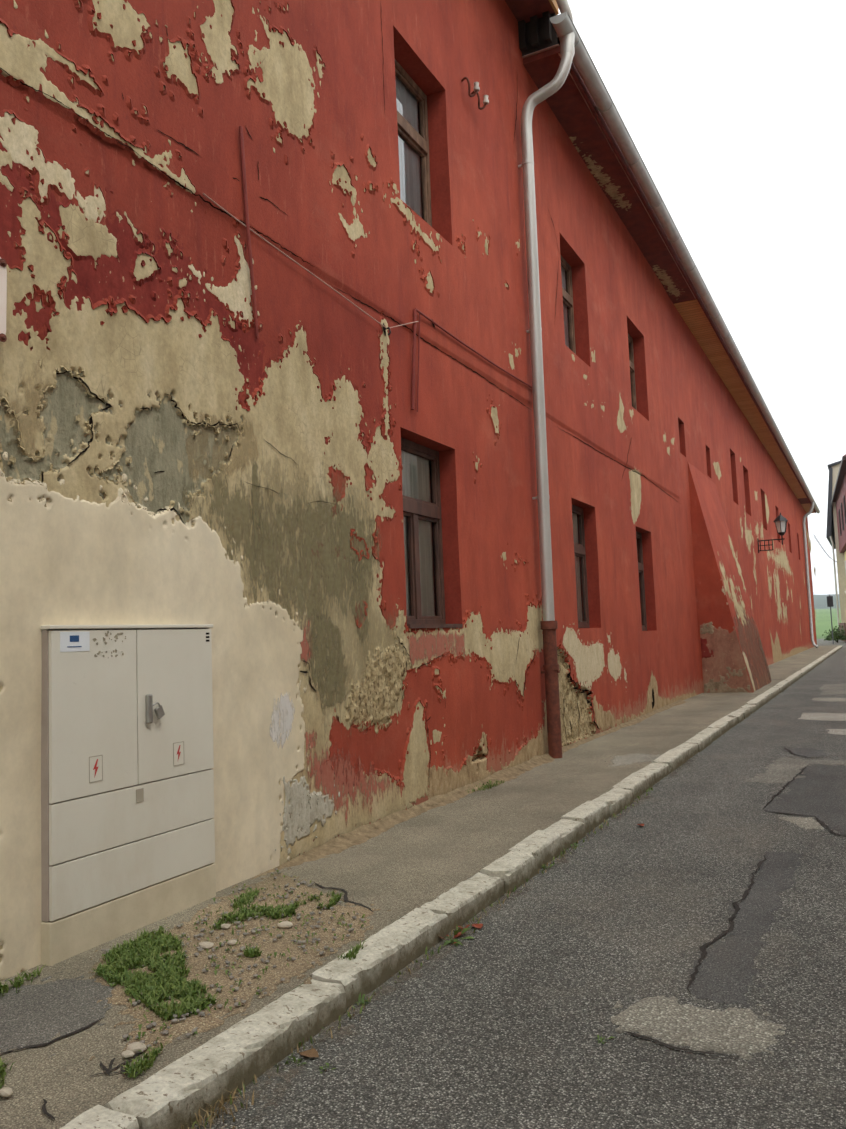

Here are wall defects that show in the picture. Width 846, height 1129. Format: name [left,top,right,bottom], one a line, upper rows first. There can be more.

crack [0,68,534,412]
crack [40,368,112,483]
crack [140,394,295,494]
peeling [0,0,548,866]
crack [563,430,678,502]
flaking render [563,491,816,733]